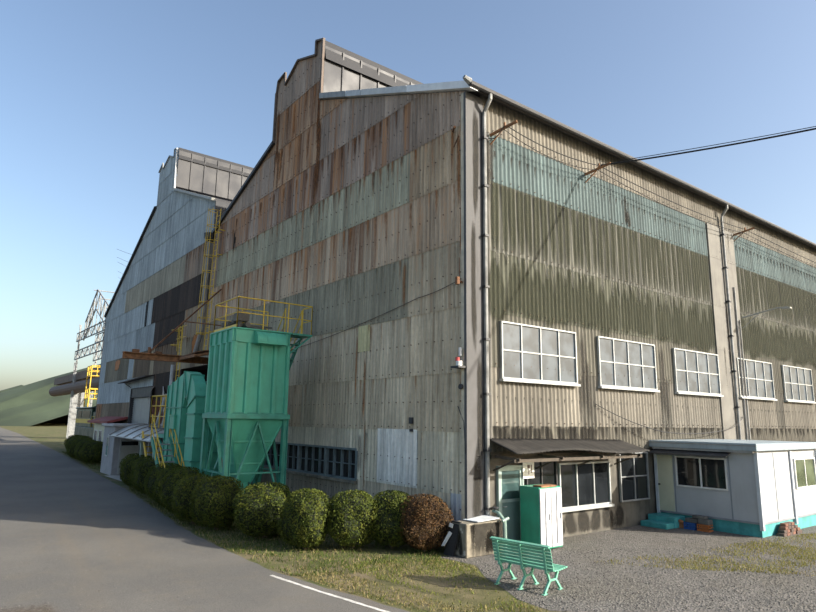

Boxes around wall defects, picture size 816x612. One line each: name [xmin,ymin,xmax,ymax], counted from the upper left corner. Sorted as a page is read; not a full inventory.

rust [227,84,403,247]
rust [443,103,461,250]
damp [473,114,732,374]
damp [736,267,816,368]
damp [456,363,503,555]
damp [579,340,601,412]
damp [493,352,720,440]
damp [751,428,816,438]
damp [563,506,624,534]